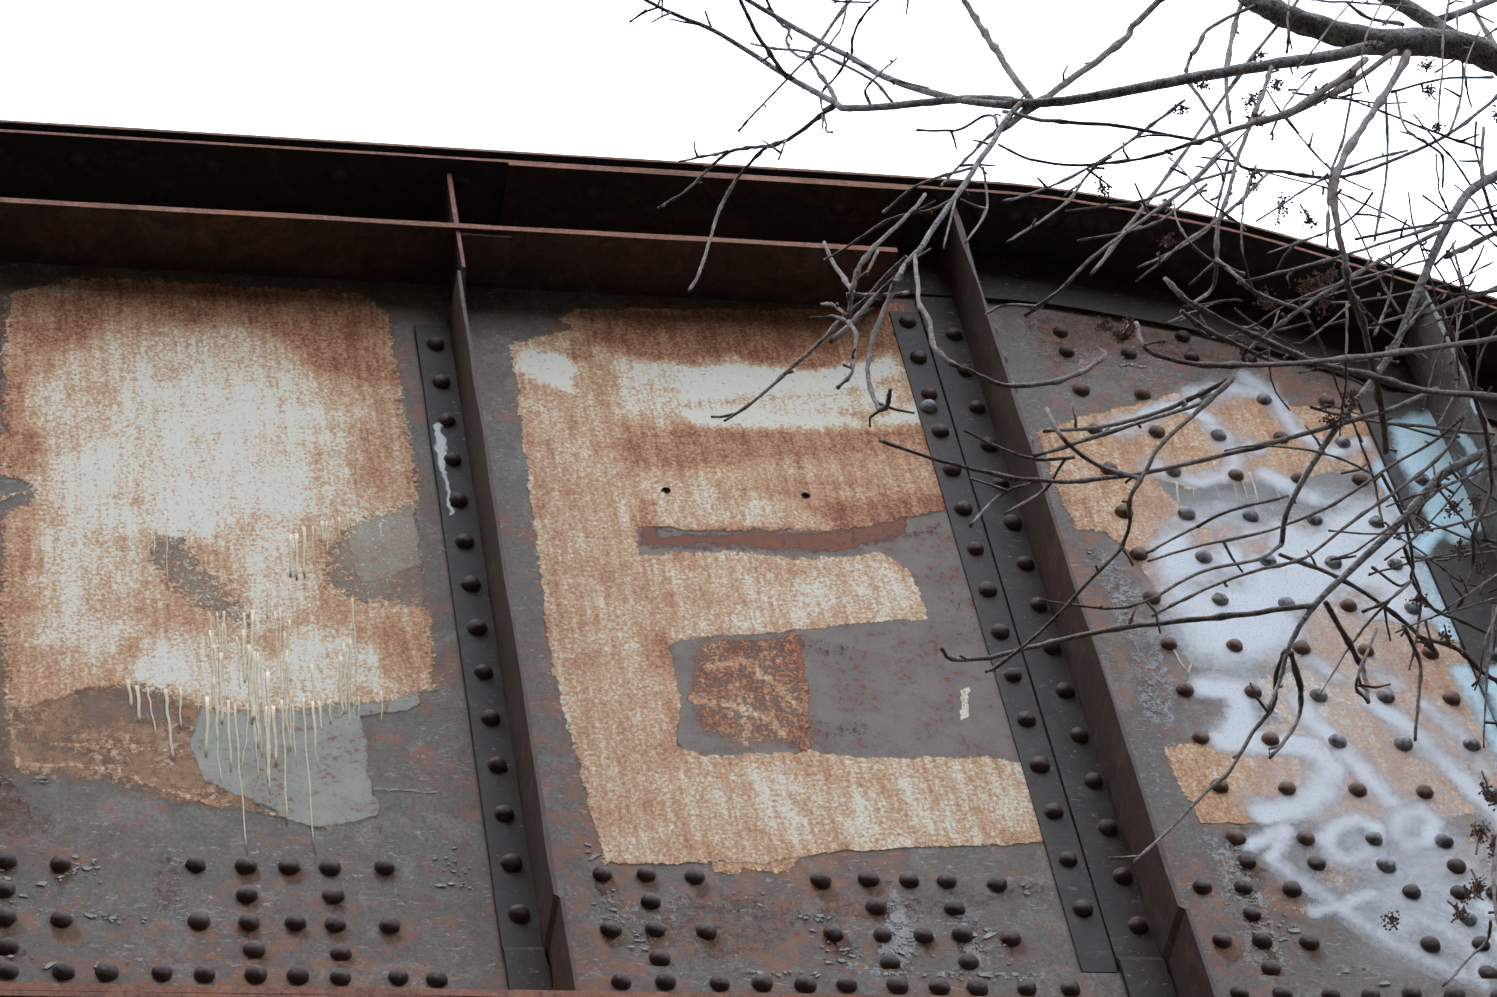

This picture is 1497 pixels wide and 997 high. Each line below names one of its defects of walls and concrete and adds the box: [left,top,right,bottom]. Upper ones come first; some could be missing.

rust [639,517,939,554]
rust [687,630,864,751]
rust [0,664,256,836]
rust [647,857,952,958]
rust [1215,843,1280,976]
rust [1301,842,1359,893]
rust [1436,838,1491,882]